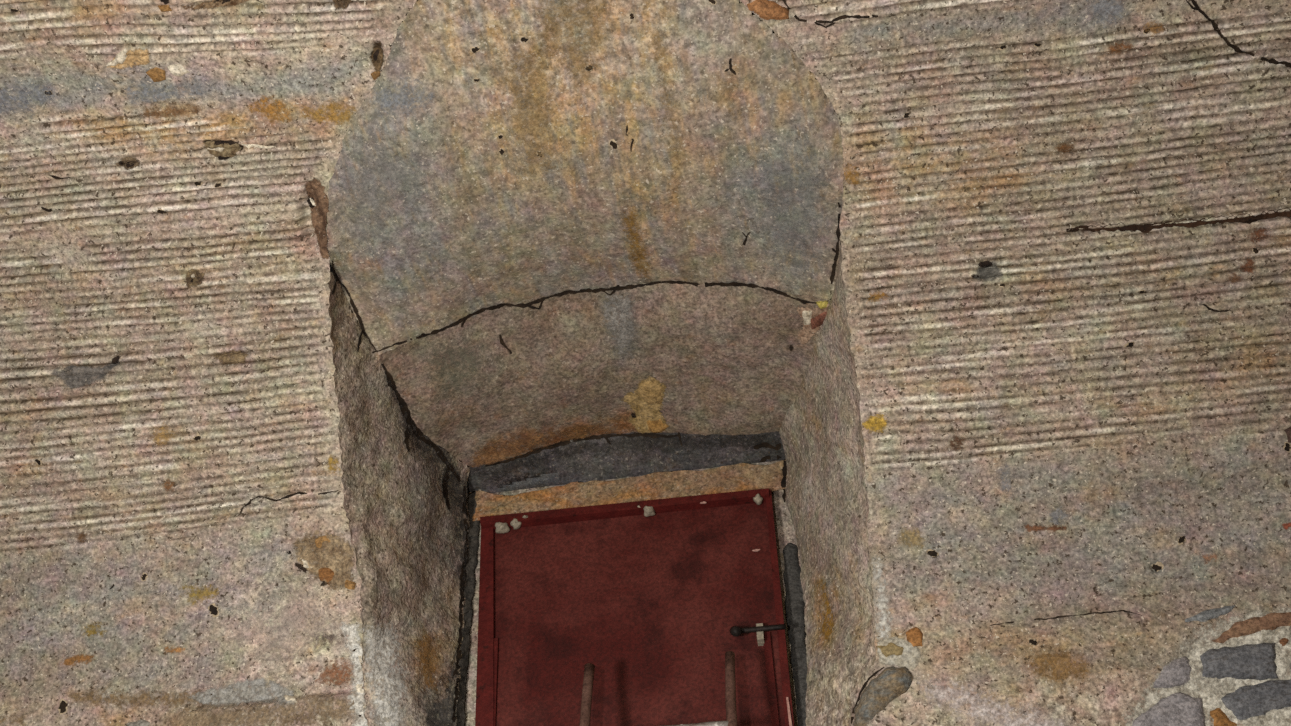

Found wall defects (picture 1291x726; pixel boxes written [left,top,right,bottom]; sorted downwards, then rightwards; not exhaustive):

crack [783,0,895,28]
crack [1186,0,1291,68]
crack [1066,208,1291,233]
crack [1202,304,1230,312]
crack [332,203,841,722]